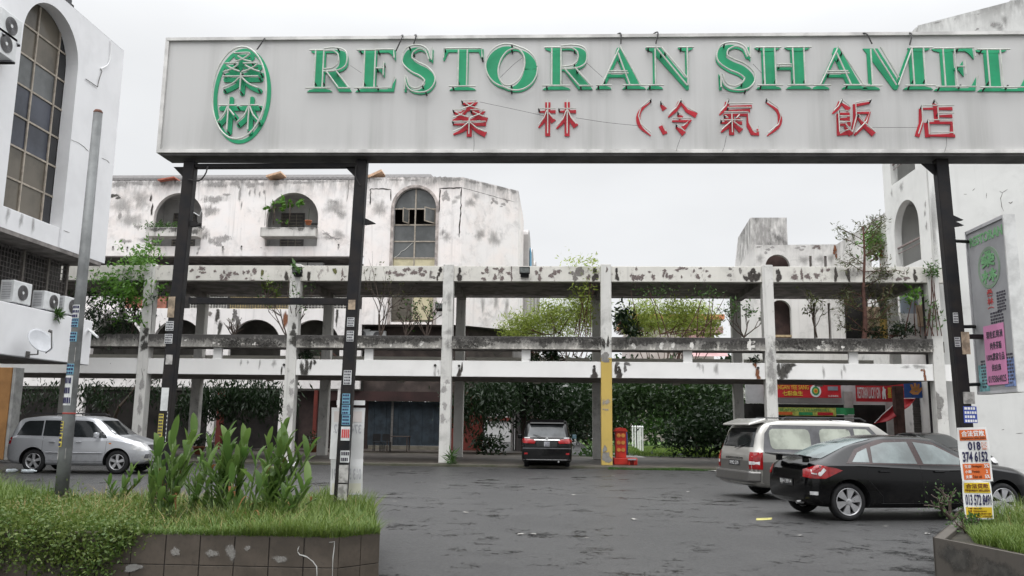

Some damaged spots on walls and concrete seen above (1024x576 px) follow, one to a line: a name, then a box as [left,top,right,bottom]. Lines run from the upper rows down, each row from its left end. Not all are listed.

water stain [433,178,516,204]
water stain [111,181,177,243]
water stain [192,181,279,254]
peeling [385,267,436,279]
peeling [481,266,513,281]
peeling [535,267,590,281]
peeling [630,267,711,281]
peeling [791,267,830,280]
water stain [358,336,934,394]